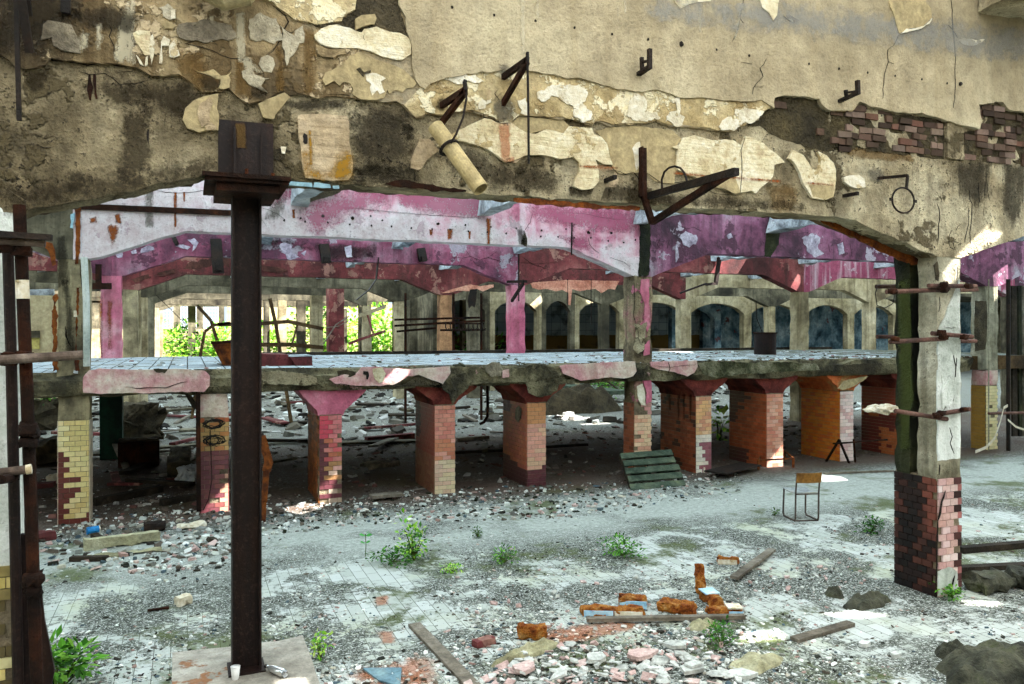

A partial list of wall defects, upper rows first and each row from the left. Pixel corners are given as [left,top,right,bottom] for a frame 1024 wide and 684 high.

crack [948,1,958,108]
water stain [0,50,217,227]
rust [236,124,246,147]
water stain [236,29,418,234]
flaking render [0,0,1024,211]
water stain [466,150,557,192]
water stain [954,160,1024,223]
peeling [262,243,306,273]
peeling [675,231,698,262]
spalling [802,220,918,265]
flaking render [330,279,820,406]